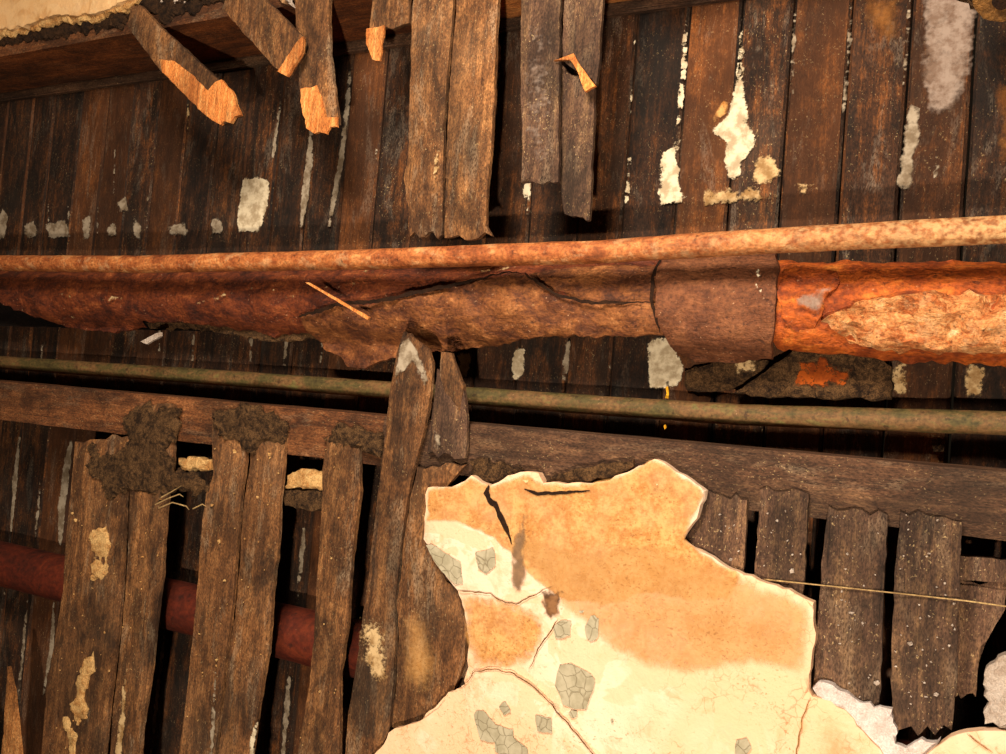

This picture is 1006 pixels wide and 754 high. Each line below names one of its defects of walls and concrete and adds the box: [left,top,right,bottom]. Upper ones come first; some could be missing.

corrosion [301,264,664,369]
corrosion [821,289,1006,355]
corrosion [795,357,848,386]
crack [483,485,512,544]
crack [524,488,590,496]
peeling [546,460,636,483]
peeling [426,545,463,584]
leakage [427,461,803,668]
crack [456,586,552,605]
crack [464,620,593,754]
peeling [555,663,595,718]
peeling [474,702,528,754]